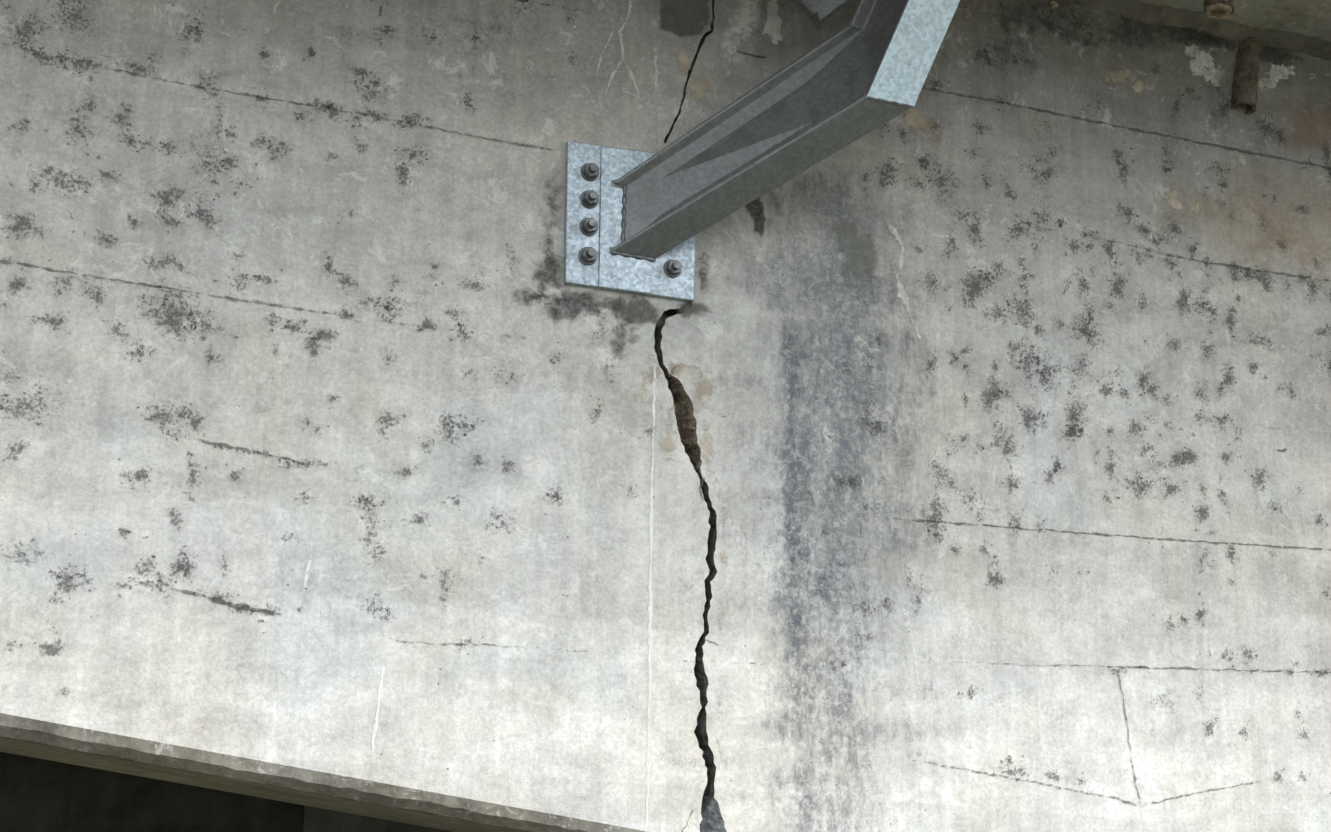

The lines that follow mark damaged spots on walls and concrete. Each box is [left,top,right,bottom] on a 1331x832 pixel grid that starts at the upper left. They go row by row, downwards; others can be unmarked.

crack [664,0,763,144]
water stain [51,253,238,362]
water stain [137,399,336,502]
water stain [265,256,403,362]
water stain [515,239,662,382]
water stain [791,185,972,611]
water stain [923,148,1331,588]
water stain [7,624,63,655]
water stain [49,554,93,602]
water stain [116,546,280,622]
crack [637,302,727,832]
crack [929,674,1253,804]